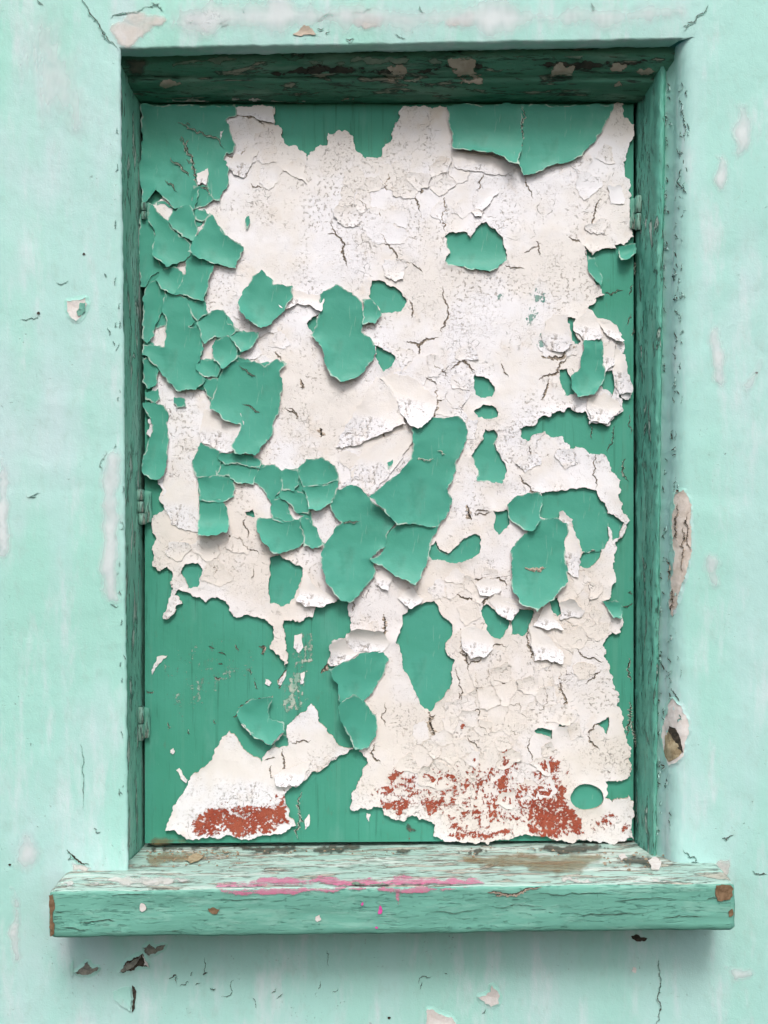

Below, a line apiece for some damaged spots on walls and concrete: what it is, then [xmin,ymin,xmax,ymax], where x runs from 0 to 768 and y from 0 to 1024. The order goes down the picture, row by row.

peeling [427,56,483,85]
crack [328,223,348,267]
crack [569,200,599,242]
crack [286,379,326,437]
crack [407,287,475,417]
crack [539,346,575,400]
peeling [139,79,637,860]
spalling [667,487,695,617]
spalling [659,696,692,767]
corrosion [192,790,289,838]
corrosion [372,749,628,840]
spalling [113,941,168,1012]